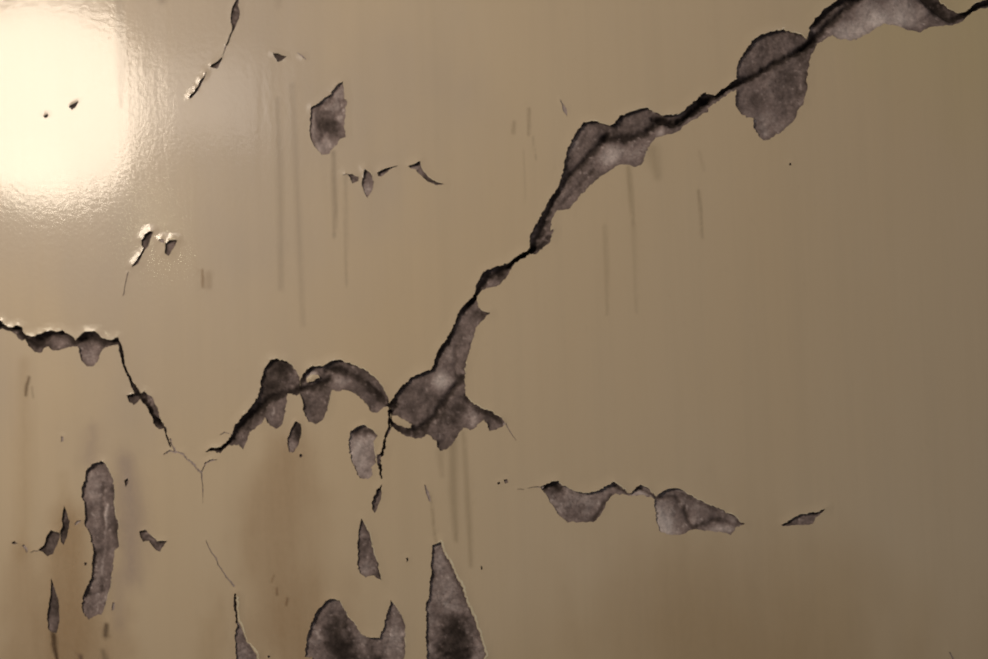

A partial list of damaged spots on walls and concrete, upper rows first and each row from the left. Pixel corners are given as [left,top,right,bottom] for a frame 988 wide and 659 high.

peeling [182,0,245,102]
peeling [303,73,453,201]
crack [0,0,988,518]
peeling [6,452,174,637]
peeling [225,585,266,659]
peeling [343,417,383,484]
peeling [299,511,497,659]
peeling [531,469,754,542]